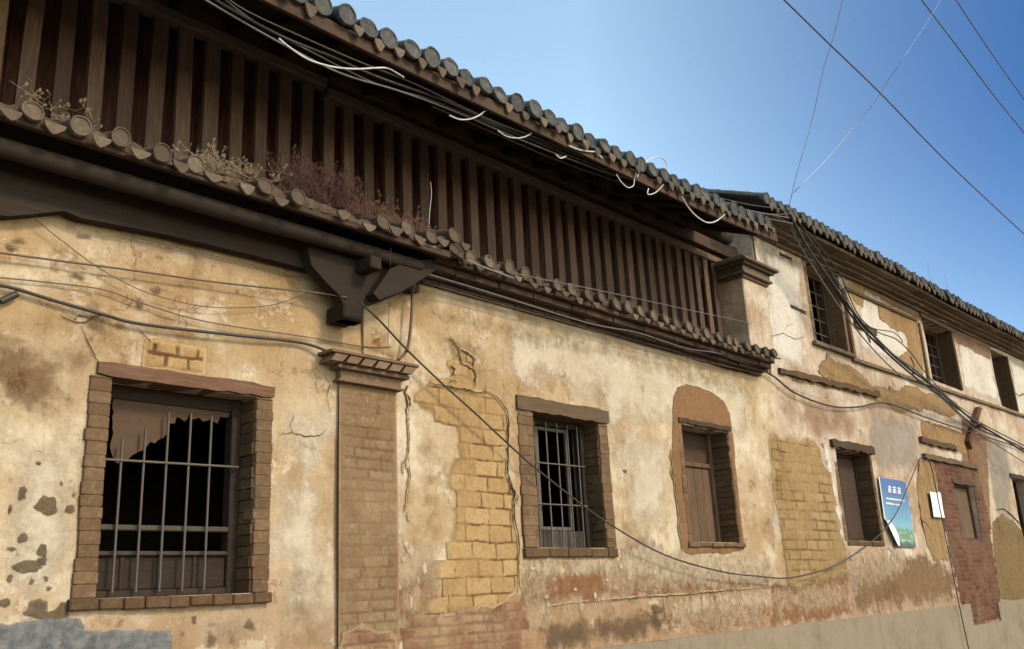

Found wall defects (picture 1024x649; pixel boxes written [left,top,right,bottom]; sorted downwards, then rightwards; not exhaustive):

damp [0,347,57,406]
crack [59,314,101,362]
spalling [142,338,207,376]
crack [281,374,330,437]
spalling [878,301,924,374]
spalling [9,486,75,516]
spalling [339,338,906,649]
spalling [819,353,1024,625]
spalling [7,533,28,551]
spalling [7,544,69,619]
damp [856,556,954,611]
damp [548,615,661,647]